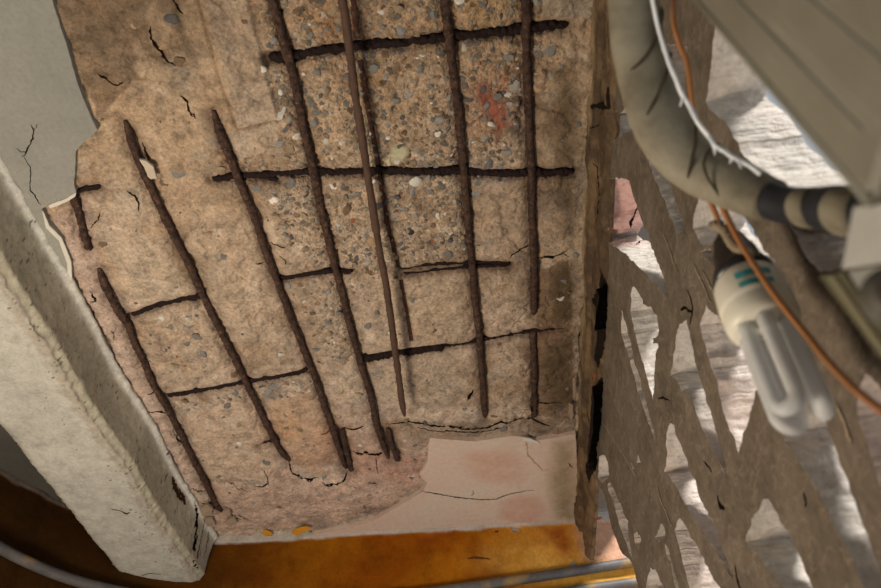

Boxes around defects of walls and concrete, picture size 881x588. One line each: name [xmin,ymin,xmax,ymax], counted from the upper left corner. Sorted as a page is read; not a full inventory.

crack [18,124,40,204]
corrosion [357,60,401,267]
spalling [43,0,603,537]
corrosion [399,280,414,341]
crack [385,402,561,433]
crack [525,441,548,471]
crack [422,490,533,500]